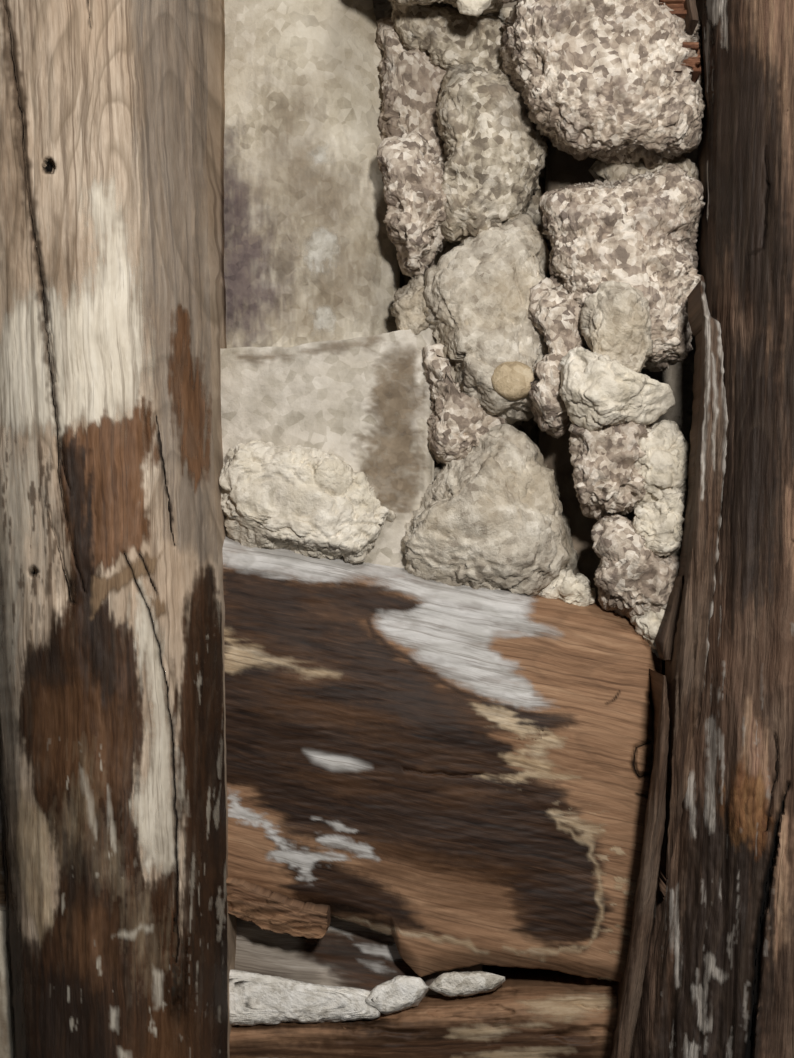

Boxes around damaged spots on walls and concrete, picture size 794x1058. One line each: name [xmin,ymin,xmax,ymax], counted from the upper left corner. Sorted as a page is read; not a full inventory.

crack [8,16,36,240]
crack [750,148,770,254]
crack [40,266,69,529]
crack [62,564,84,603]
crack [745,734,789,1058]